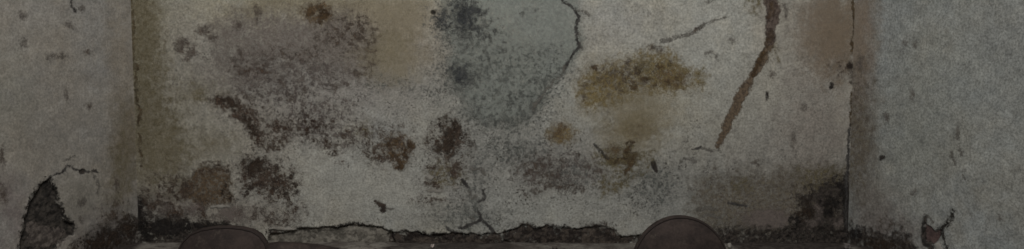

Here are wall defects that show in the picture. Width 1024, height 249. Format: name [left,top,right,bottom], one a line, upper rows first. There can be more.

spalling [17,176,86,249]
damp [69,6,386,249]
mould [422,0,495,48]
crack [446,210,495,234]
mould [412,64,602,230]
crack [532,0,590,111]
crack [659,0,727,59]
corrosion [715,0,787,149]
damp [694,87,916,249]
peeling [906,209,955,249]